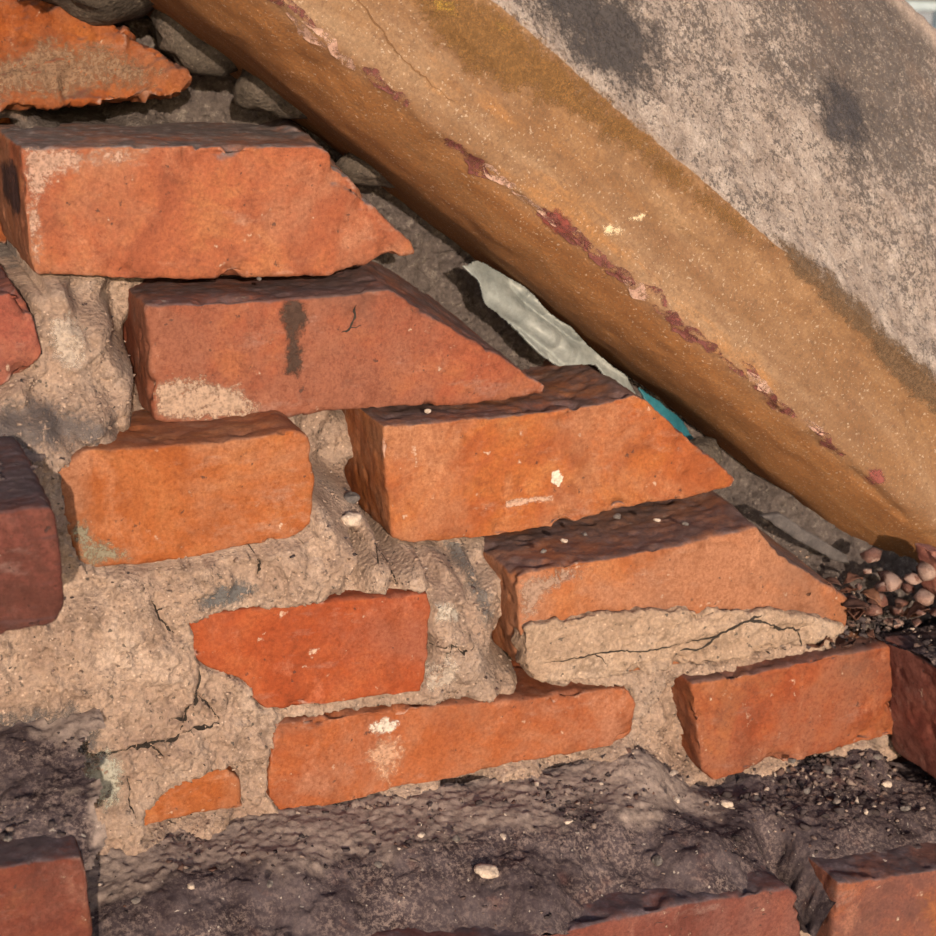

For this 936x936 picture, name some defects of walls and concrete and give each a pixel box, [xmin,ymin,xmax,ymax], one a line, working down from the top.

peeling [270,0,410,107]
crack [357,0,457,101]
water stain [420,0,752,239]
water stain [815,67,875,166]
peeling [445,138,846,457]
crack [546,615,806,664]